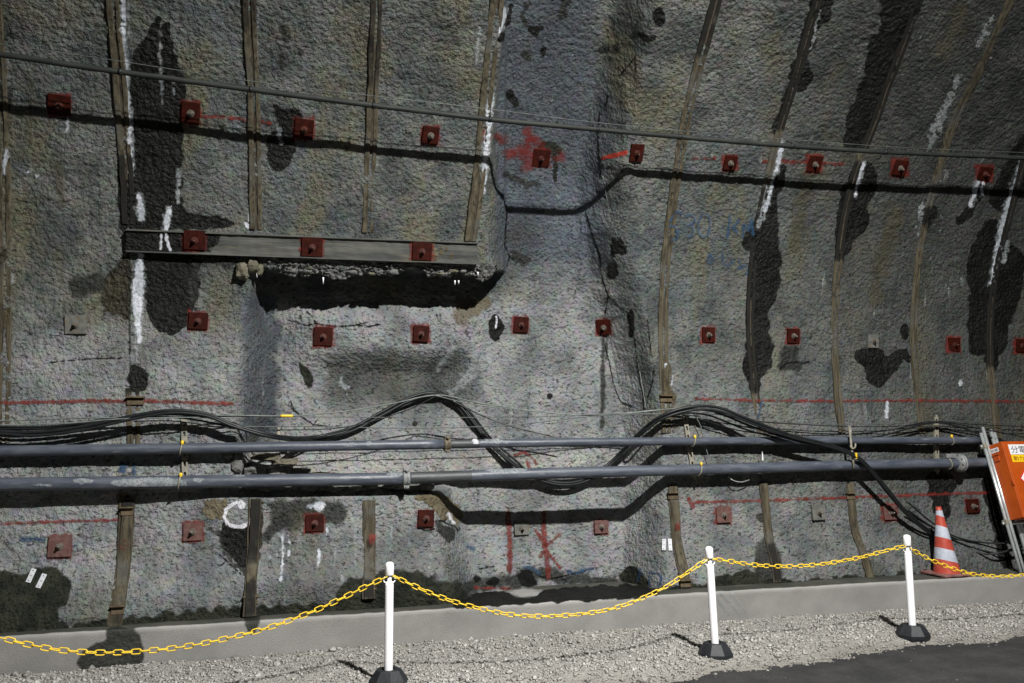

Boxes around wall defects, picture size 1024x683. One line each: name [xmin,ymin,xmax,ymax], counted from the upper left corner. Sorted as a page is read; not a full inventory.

damp [69,0,250,392]
damp [266,104,303,172]
spalling [257,257,498,283]
crack [585,212,655,398]
damp [742,0,834,393]
damp [835,0,921,261]
damp [854,323,911,387]
damp [956,136,1024,374]
damp [0,538,859,669]